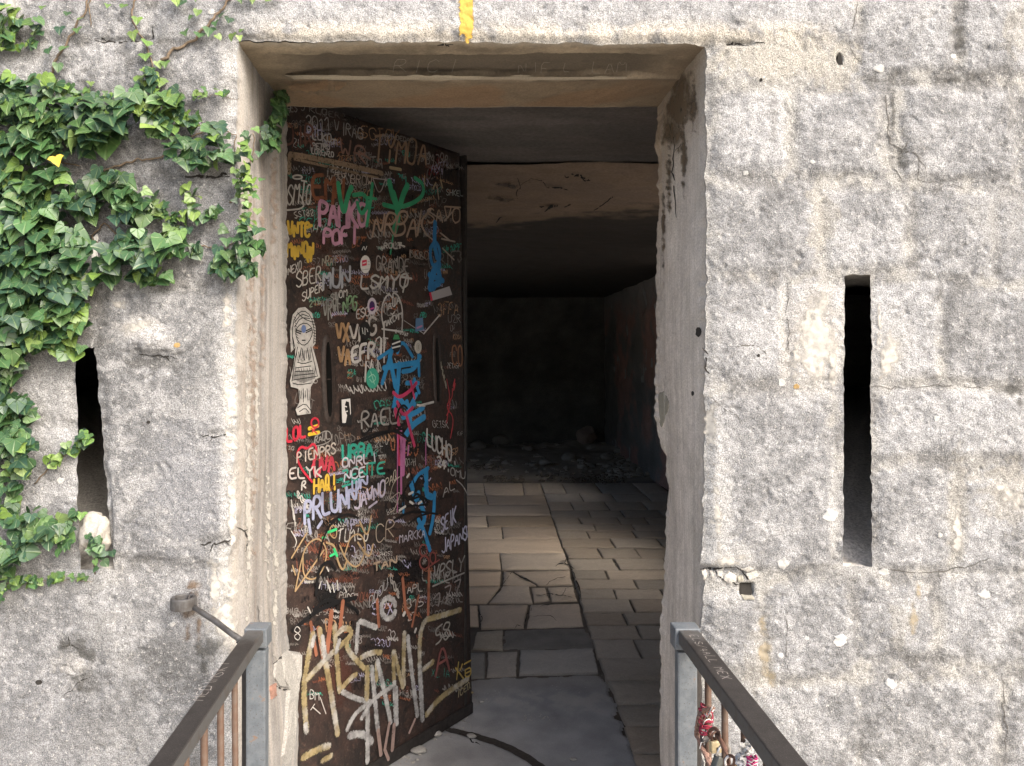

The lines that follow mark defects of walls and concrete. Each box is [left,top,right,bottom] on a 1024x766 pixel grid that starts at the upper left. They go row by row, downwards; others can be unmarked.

damp [661,75,696,267]
crack [885,95,968,188]
crack [501,559,581,628]
peeling [737,567,758,582]